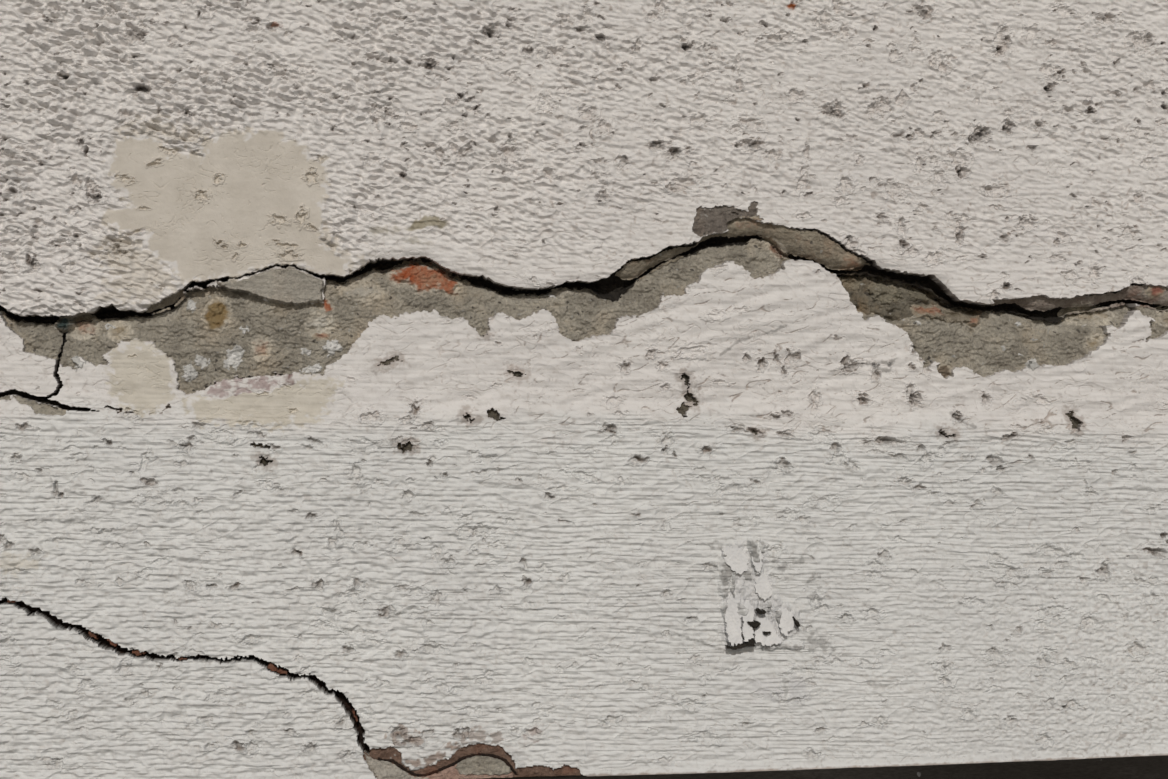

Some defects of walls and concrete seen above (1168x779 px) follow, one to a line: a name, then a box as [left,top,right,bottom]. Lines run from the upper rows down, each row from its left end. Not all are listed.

flaking render [1,201,783,466]
crack [0,215,1168,413]
flaking render [836,273,1168,378]
crack [948,409,978,430]
flaking render [1065,410,1081,429]
crack [0,598,371,753]
flaking render [363,720,582,779]